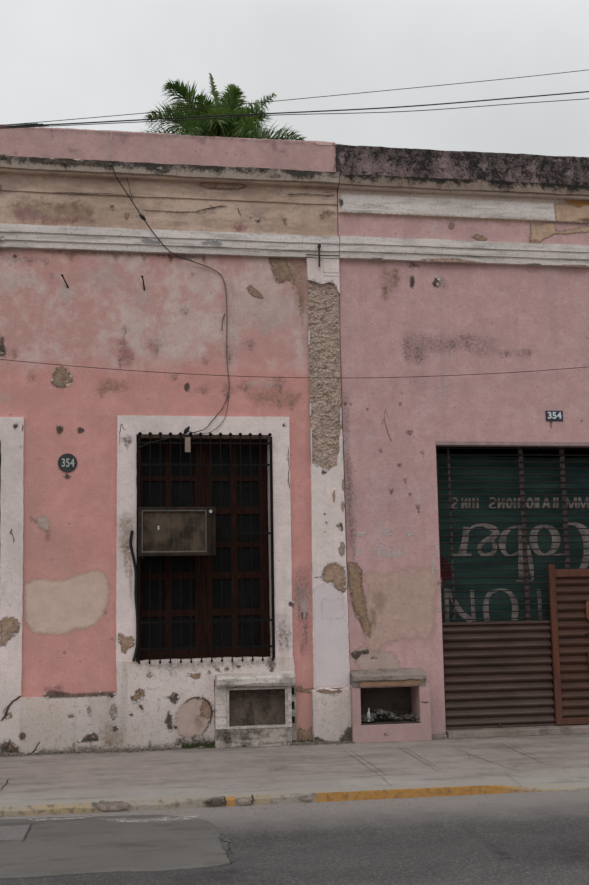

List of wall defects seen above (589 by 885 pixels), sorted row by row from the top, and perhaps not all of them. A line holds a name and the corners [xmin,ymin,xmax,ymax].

peeling [529,202,589,243]
flaking render [246,284,263,299]
flaking render [51,366,72,389]
flaking render [308,279,343,474]
flaking render [322,542,371,638]
flaking render [0,616,20,646]
flaking render [117,633,136,655]
peeling [42,687,119,731]
flaking render [129,688,145,716]